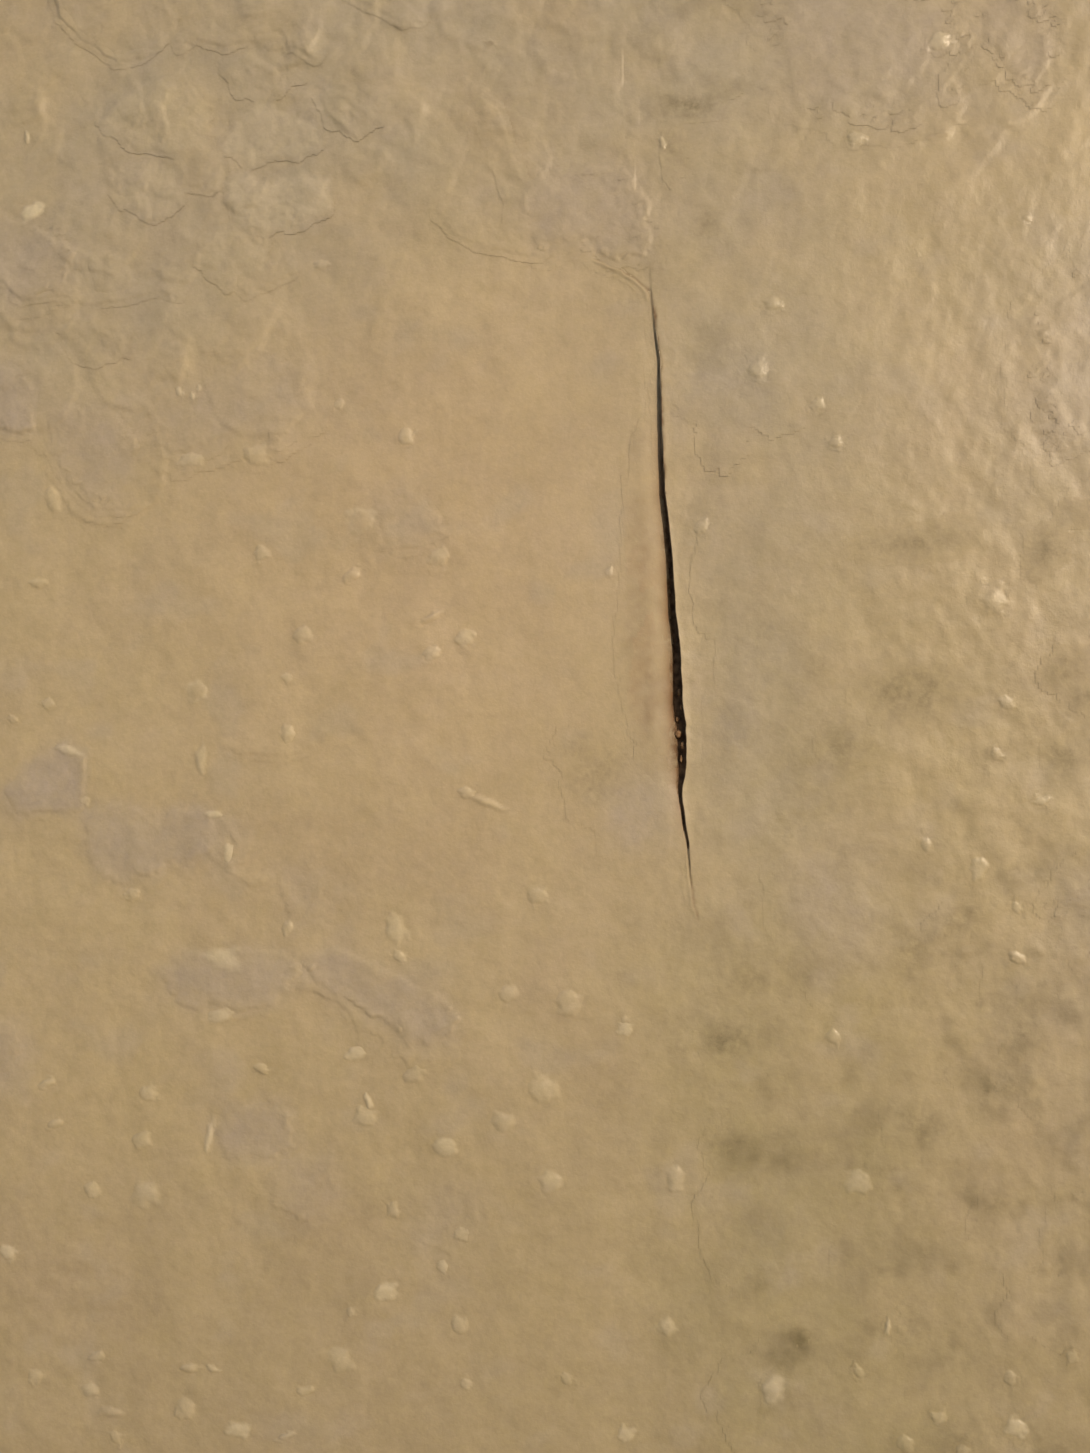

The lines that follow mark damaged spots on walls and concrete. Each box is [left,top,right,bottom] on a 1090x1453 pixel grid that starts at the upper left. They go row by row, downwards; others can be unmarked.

crack [590,251,706,924]